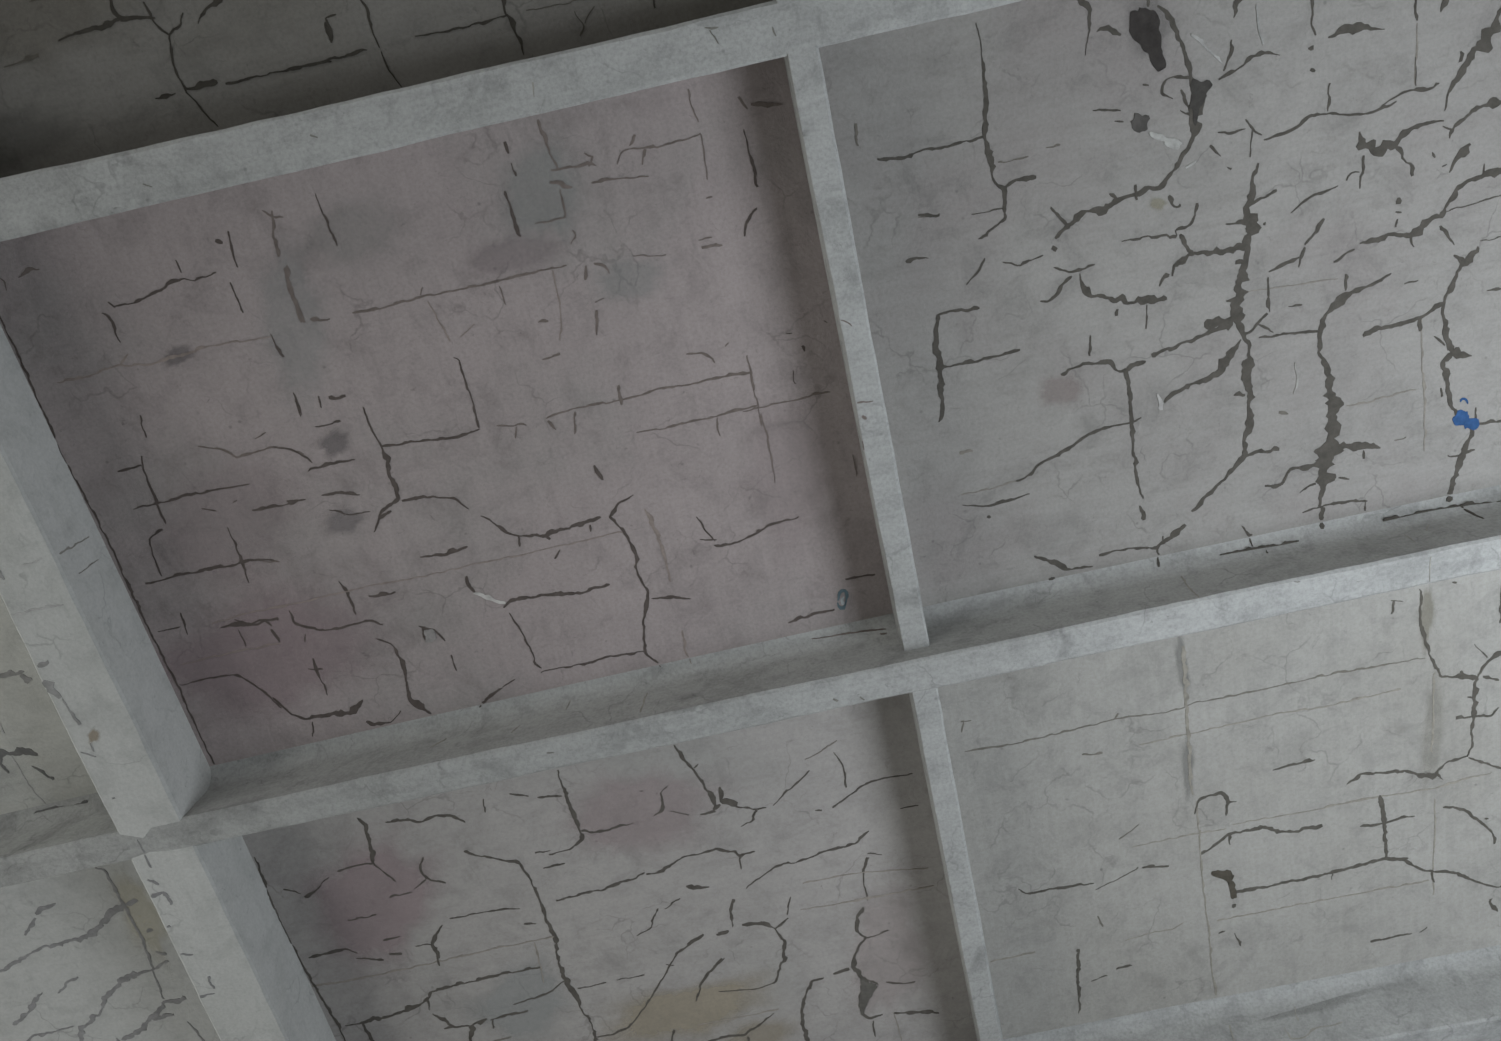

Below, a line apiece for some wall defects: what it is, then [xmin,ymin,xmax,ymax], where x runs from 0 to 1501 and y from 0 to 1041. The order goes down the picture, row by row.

spalling [1129,7,1166,72]
crack [0,724,115,814]
crack [254,740,939,1041]